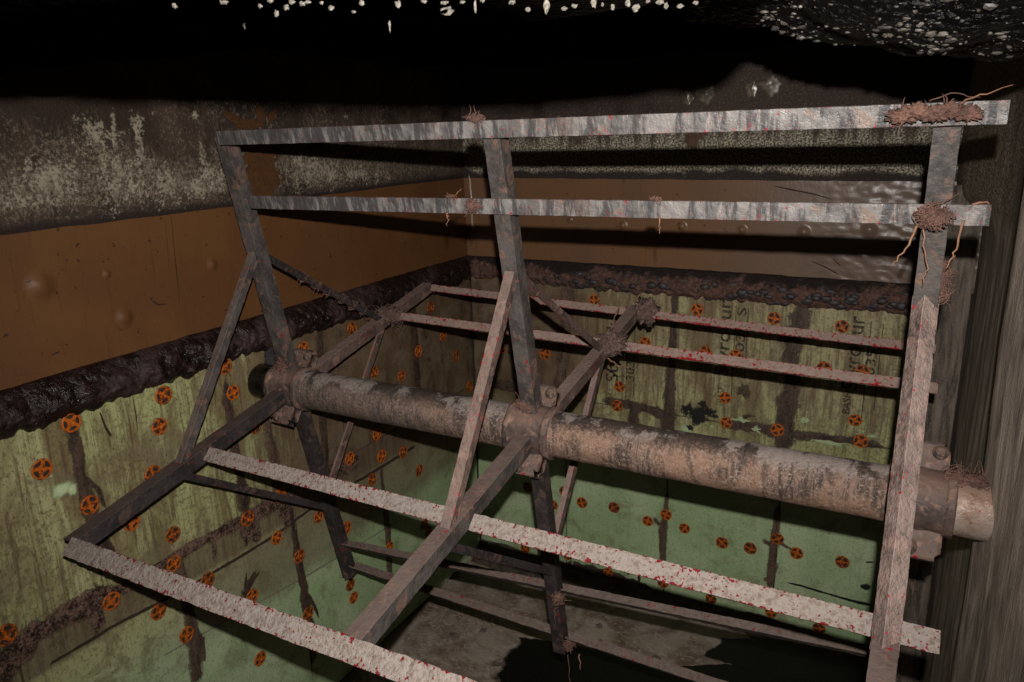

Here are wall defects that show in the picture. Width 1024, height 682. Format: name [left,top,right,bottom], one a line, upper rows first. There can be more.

leakage [0,111,226,218]